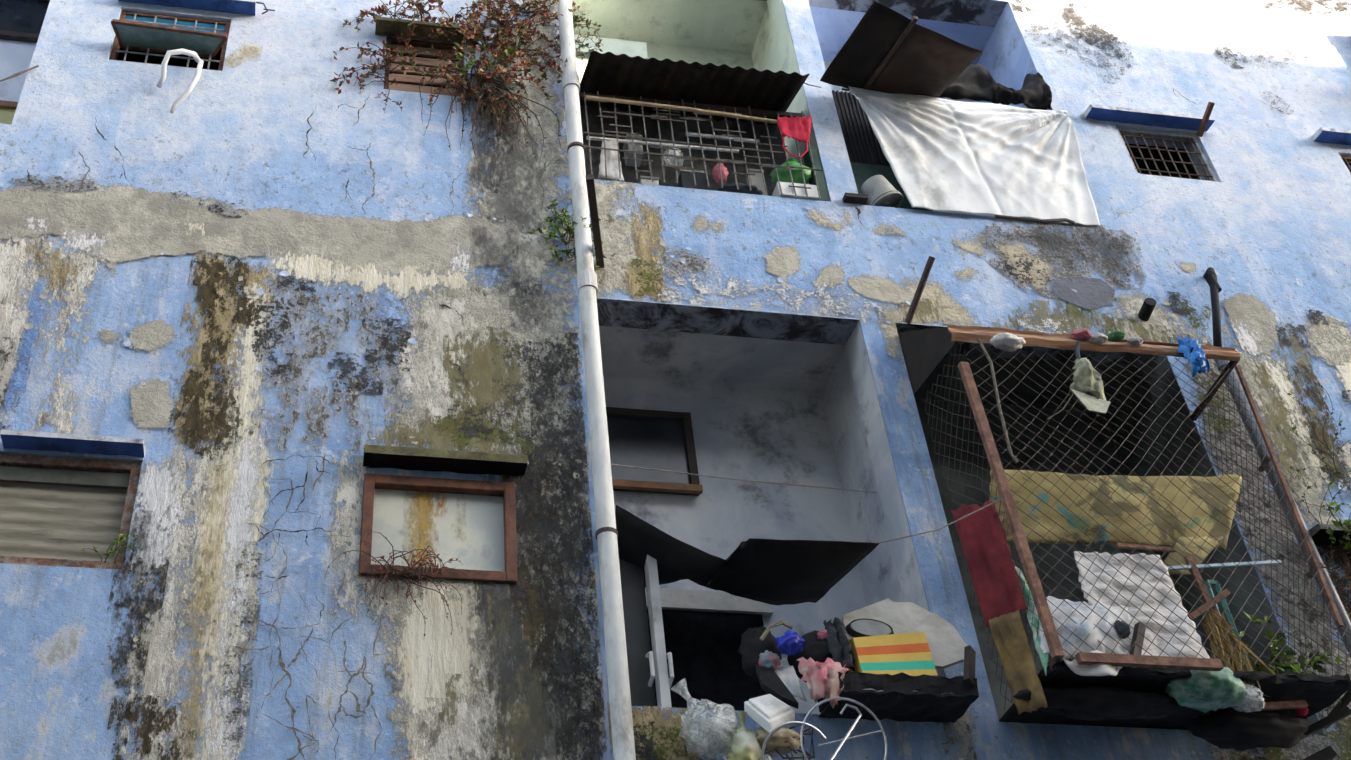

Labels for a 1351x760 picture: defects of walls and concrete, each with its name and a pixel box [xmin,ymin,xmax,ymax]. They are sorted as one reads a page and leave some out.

damp [1208,27,1316,69]
spalling [11,172,104,194]
flaking render [0,229,117,434]
spalling [170,191,248,218]
peeling [249,0,612,760]
peeling [588,179,986,364]
damp [971,219,1145,300]
damp [127,250,282,760]
flaking render [1100,291,1351,679]
crack [234,454,387,760]
peeling [632,705,714,760]
peeling [1207,694,1351,760]